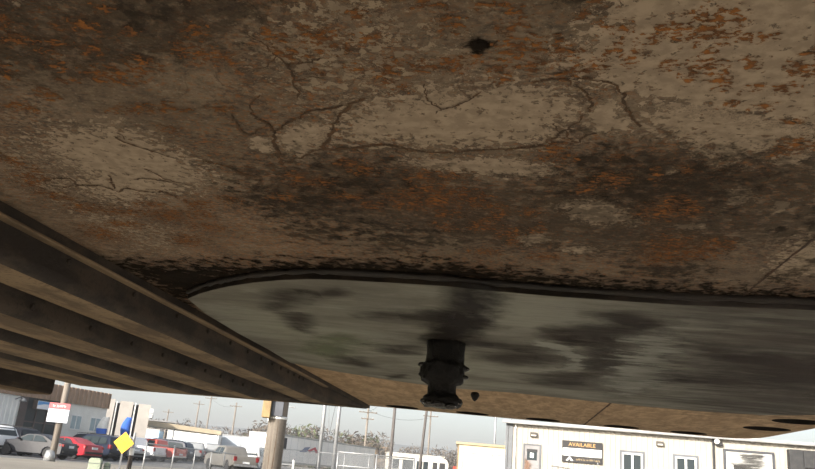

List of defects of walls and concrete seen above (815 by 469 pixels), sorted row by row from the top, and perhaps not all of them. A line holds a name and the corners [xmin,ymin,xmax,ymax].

crack [231,34,642,165]
peeling [230,0,815,180]
corrosion [258,0,815,112]
crack [43,132,194,200]
water stain [102,157,815,309]
peeling [512,231,601,255]
peeling [545,195,651,228]
water stain [474,313,695,398]